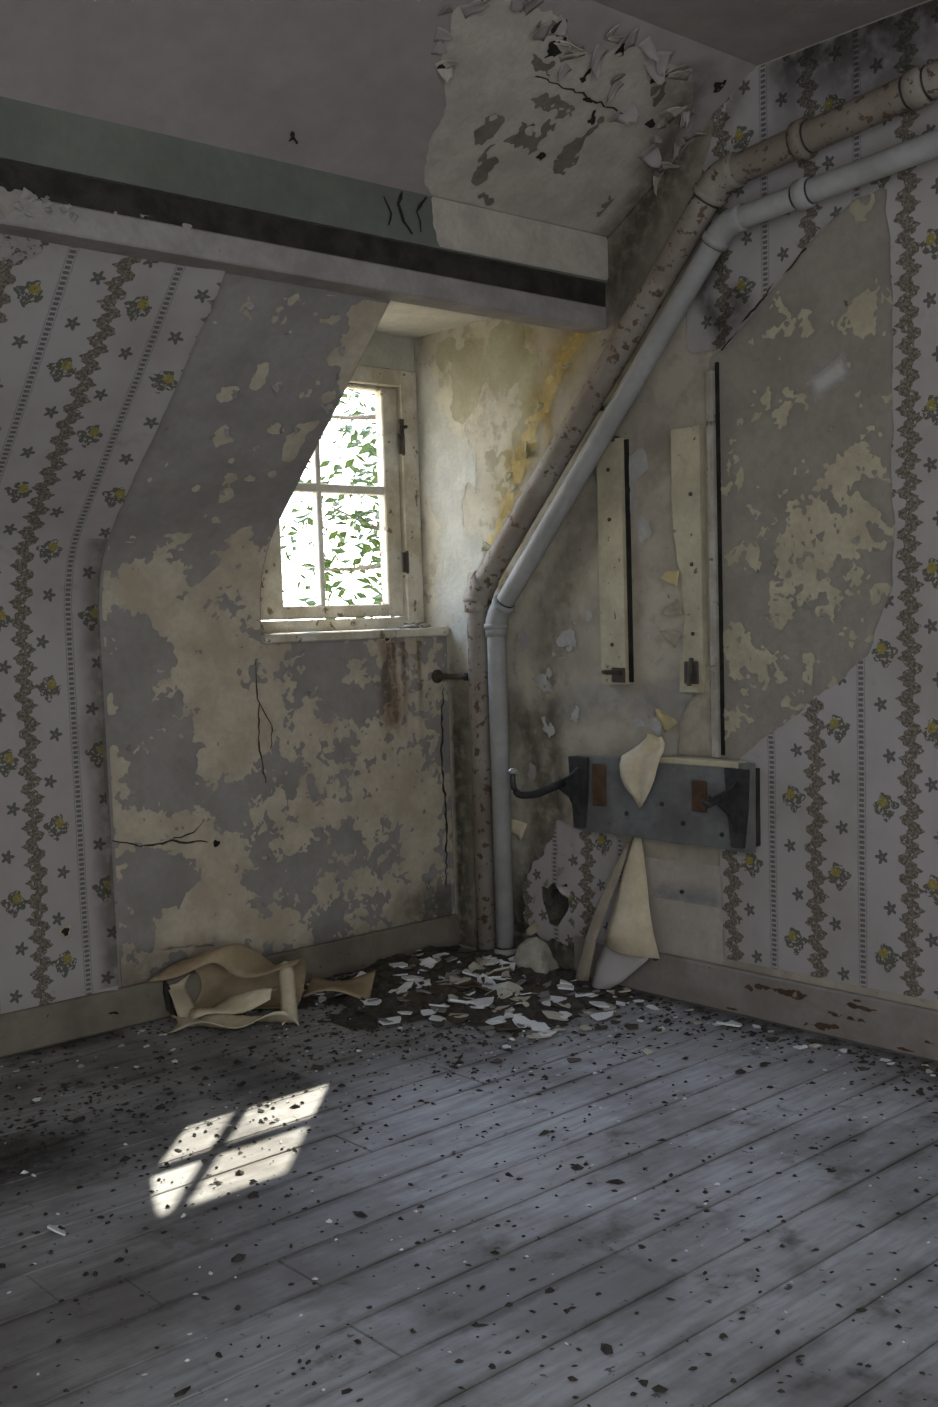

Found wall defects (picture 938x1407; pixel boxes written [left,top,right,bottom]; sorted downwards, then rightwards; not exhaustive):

flaking render [424,0,706,280]
peeling [0,186,78,264]
peeling [748,291,815,345]
peeling [831,278,893,339]
peeling [629,448,651,544]
peeling [721,386,896,648]
peeling [102,294,605,986]
peeling [723,621,837,740]